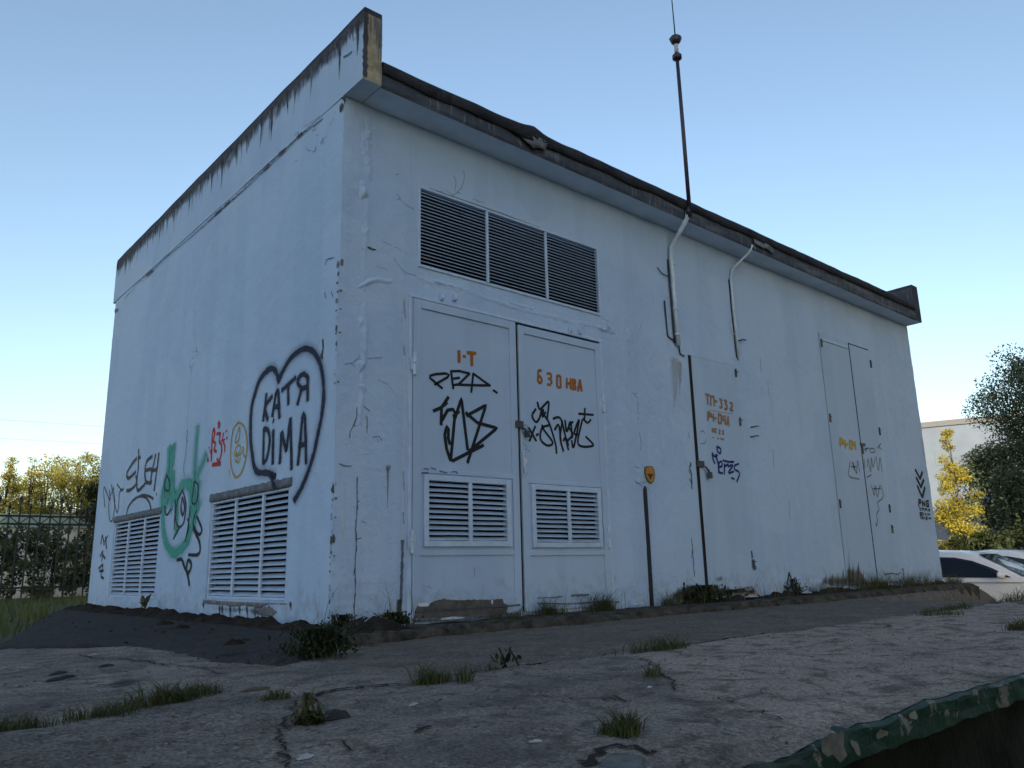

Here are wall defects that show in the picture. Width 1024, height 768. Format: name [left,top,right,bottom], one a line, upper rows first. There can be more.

damp [116,10,382,273]
crack [349,406,382,440]
peeling [413,594,619,623]